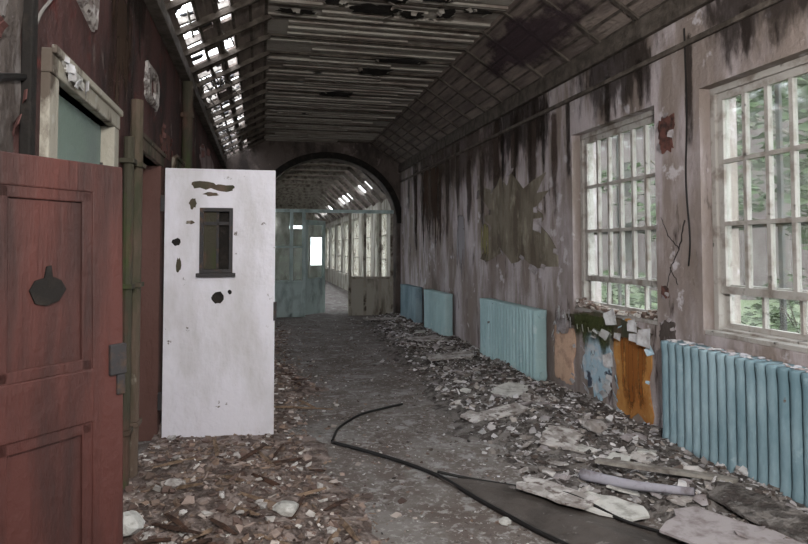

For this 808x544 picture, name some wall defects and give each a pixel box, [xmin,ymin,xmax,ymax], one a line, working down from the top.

peeling [0,0,28,152]
water stain [408,94,570,274]
water stain [579,39,651,122]
peeling [655,113,675,154]
water stain [706,0,808,63]
peeling [551,305,676,425]